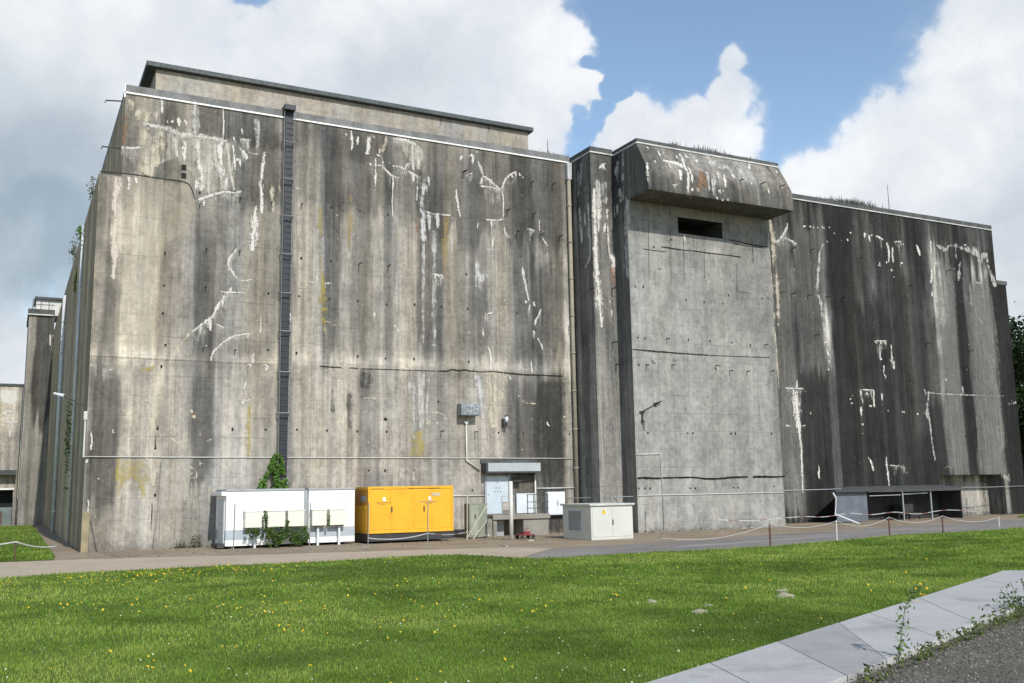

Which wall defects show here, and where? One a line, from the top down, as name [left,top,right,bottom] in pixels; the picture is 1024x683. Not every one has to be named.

water stain [145,398,218,501]
efflorescence [110,99,280,279]
water stain [345,130,461,347]
efflorescence [408,373,438,438]
crack [321,268,563,404]
efflorescence [474,348,511,428]
water stain [536,382,563,530]
efflorescence [577,151,632,328]
efflorescence [815,244,830,370]
efflorescence [878,240,936,296]